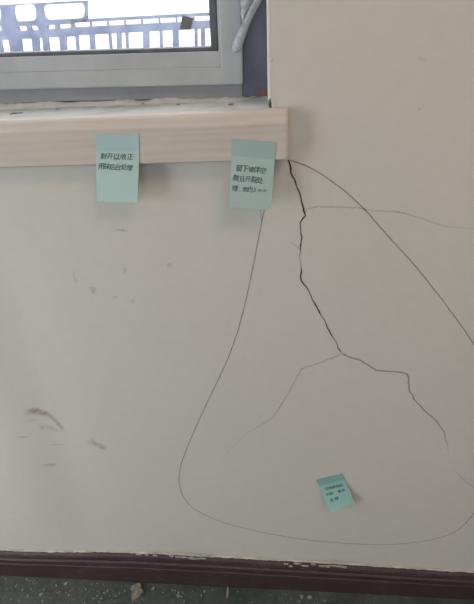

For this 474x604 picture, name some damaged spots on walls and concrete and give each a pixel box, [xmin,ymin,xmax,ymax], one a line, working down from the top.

crack [288,160,440,426]